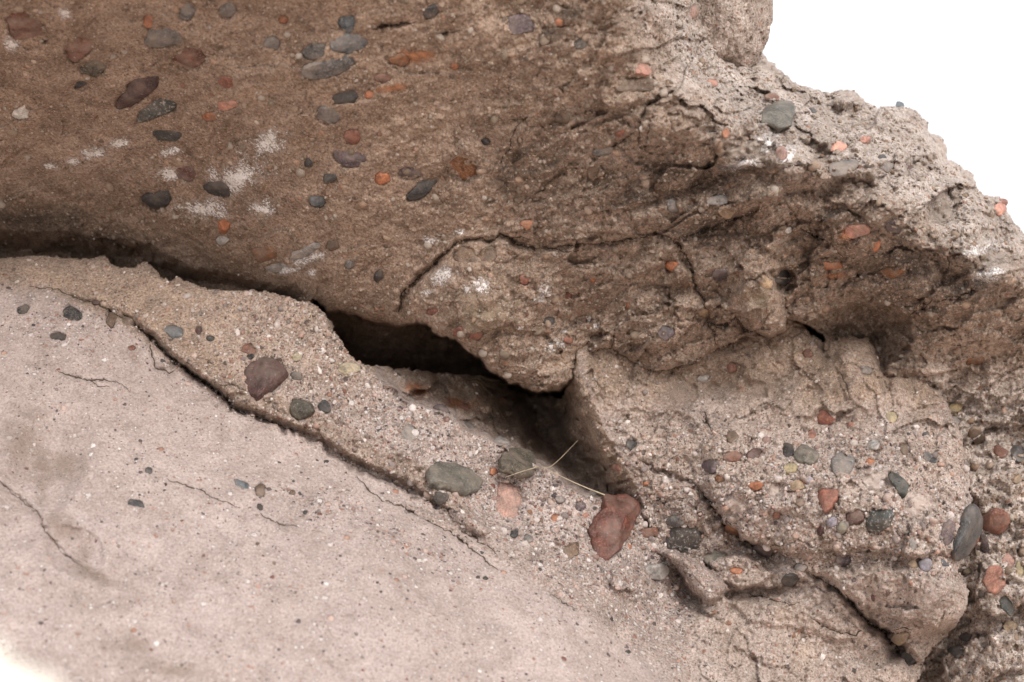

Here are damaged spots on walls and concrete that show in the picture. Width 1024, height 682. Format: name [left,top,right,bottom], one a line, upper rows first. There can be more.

crack [499,117,528,164]
crack [613,91,673,147]
crack [398,206,764,373]
crack [29,286,298,433]
crack [1,482,93,574]
crack [168,479,298,527]